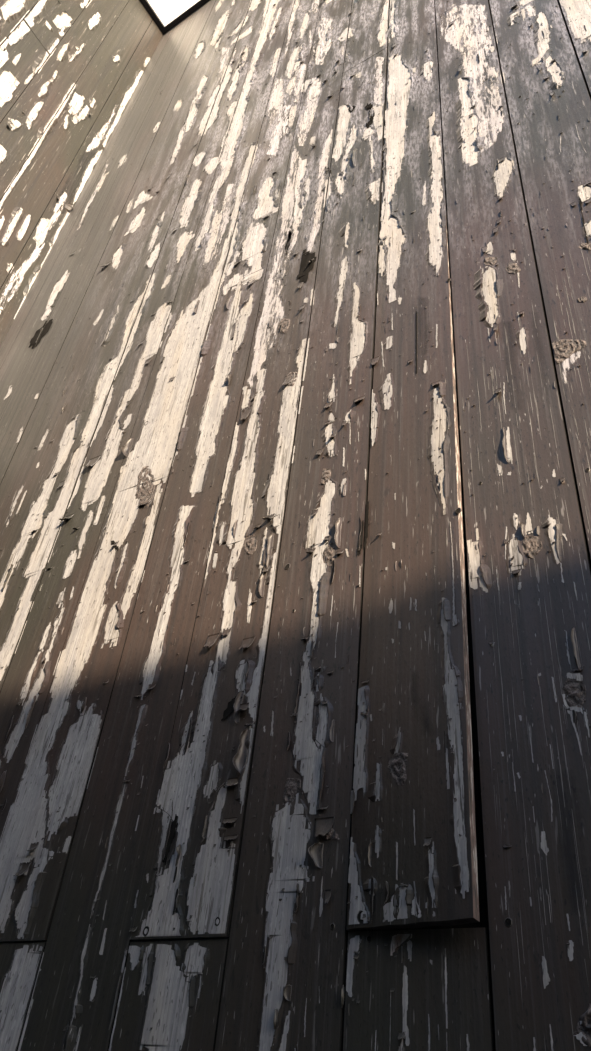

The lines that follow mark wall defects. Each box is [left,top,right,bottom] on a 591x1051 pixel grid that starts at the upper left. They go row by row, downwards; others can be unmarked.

peeling [477,0,591,99]
peeling [445,70,486,171]
peeling [486,152,516,221]
peeling [468,235,531,372]
peeling [467,528,493,596]
peeling [506,507,563,590]
peeling [560,665,585,713]
peeling [541,831,549,855]
peeling [542,956,550,989]